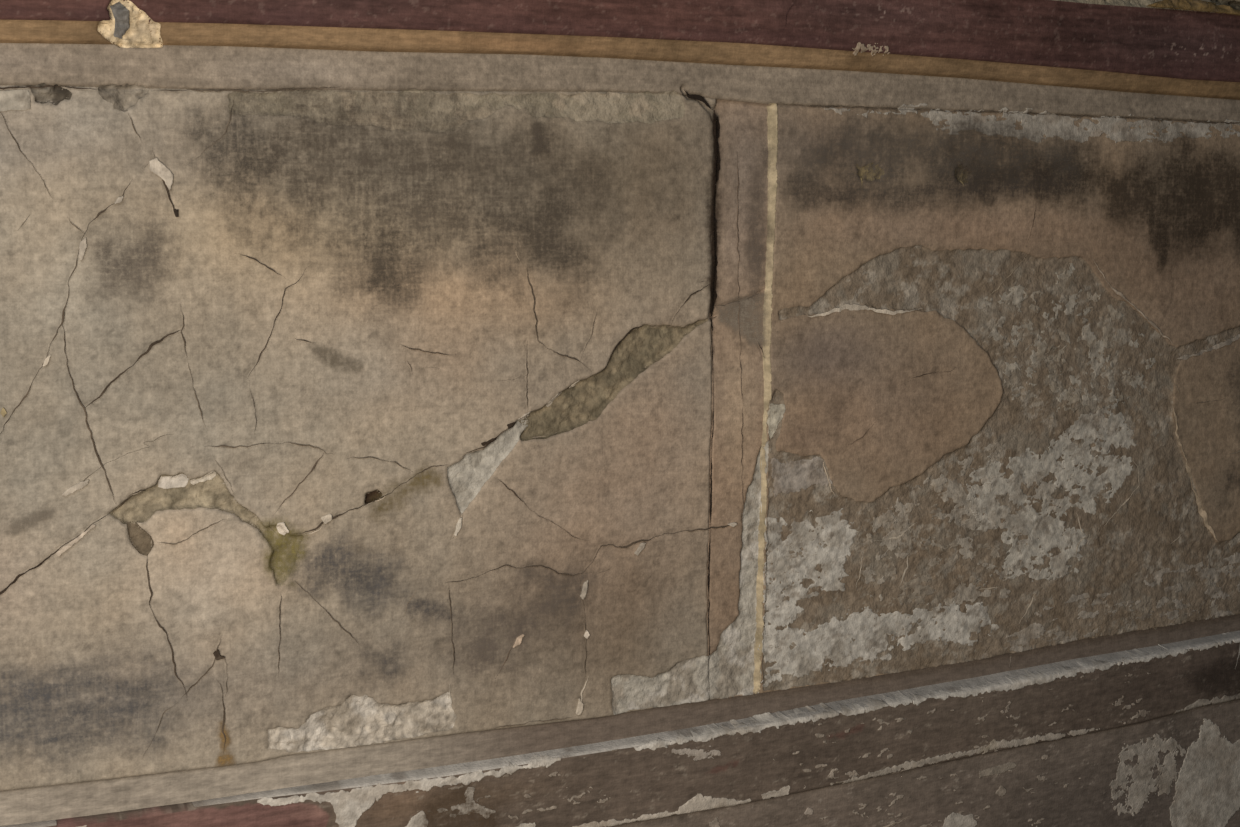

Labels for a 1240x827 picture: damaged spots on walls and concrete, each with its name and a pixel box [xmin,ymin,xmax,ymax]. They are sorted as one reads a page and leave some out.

crack [0,85,447,595]
flaking render [365,490,387,505]
flaking render [447,319,708,514]
crack [447,90,755,729]
flaking render [611,103,1240,715]
water stain [0,674,147,743]
crack [144,521,228,754]
crack [278,582,360,673]
flaking render [268,692,457,753]
peeling [257,754,611,827]
peeling [573,632,1240,827]